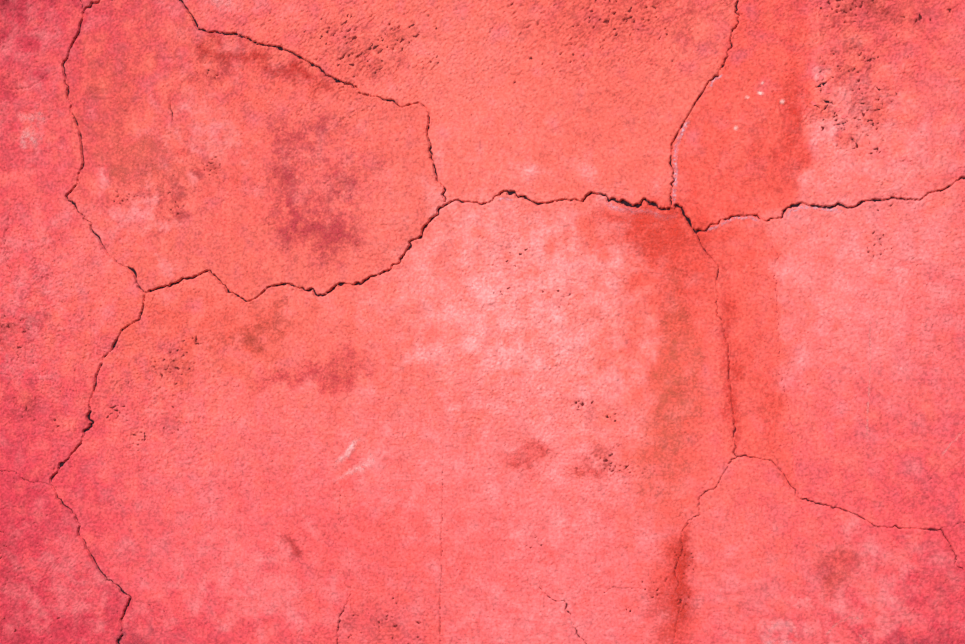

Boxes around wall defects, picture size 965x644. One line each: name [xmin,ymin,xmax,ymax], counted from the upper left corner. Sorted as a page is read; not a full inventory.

crack [10,0,113,95]
crack [179,0,965,297]
crack [1,115,247,644]
crack [687,299,902,529]
crack [922,522,965,568]